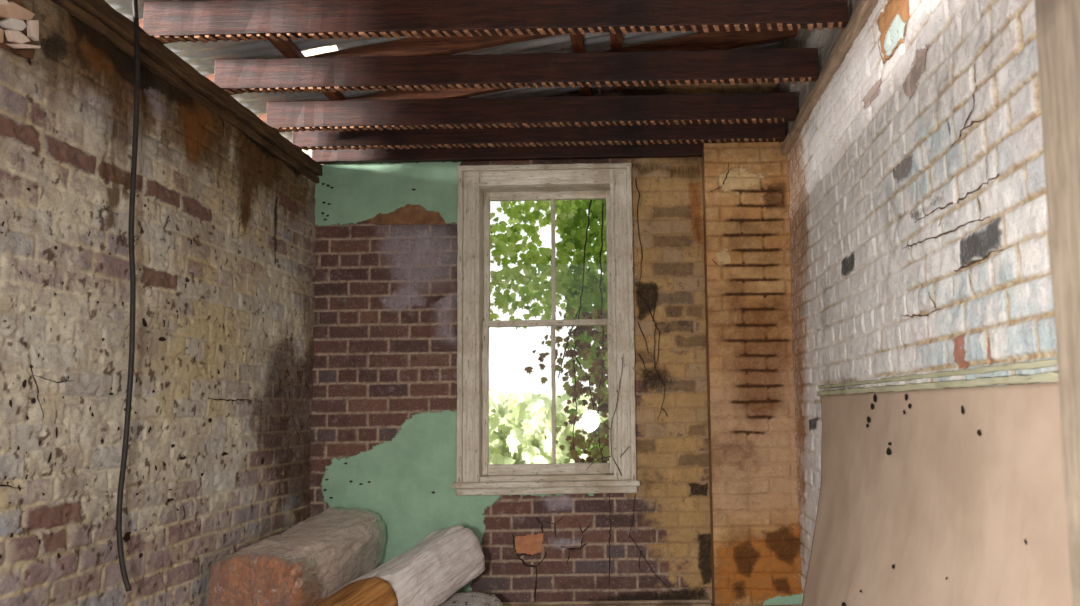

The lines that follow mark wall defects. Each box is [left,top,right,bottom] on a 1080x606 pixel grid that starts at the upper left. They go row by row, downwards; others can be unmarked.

damp [41,16,229,228]
peeling [864,79,882,108]
peeling [876,0,910,62]
peeling [903,46,929,100]
crack [947,63,987,147]
damp [238,132,300,229]
flaking render [314,162,461,226]
crack [905,163,998,249]
crack [904,292,940,318]
crack [954,249,1003,295]
flaking render [321,410,562,564]
crack [512,493,611,602]